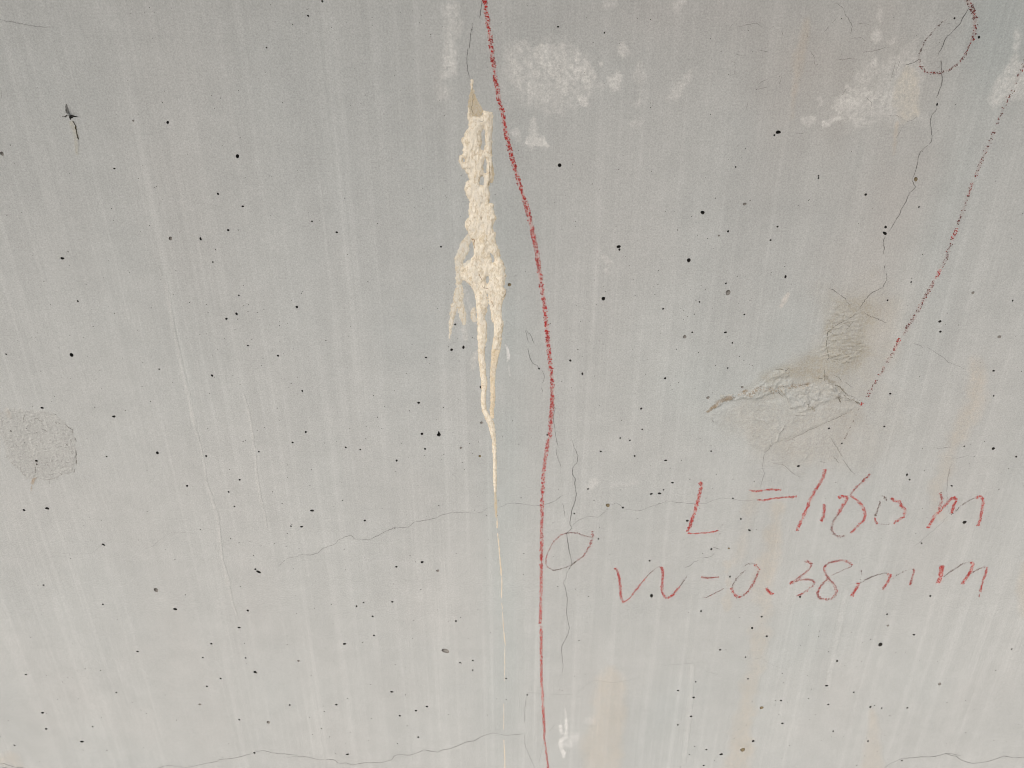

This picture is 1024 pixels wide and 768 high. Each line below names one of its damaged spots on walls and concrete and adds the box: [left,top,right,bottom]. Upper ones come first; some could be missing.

efflorescence [433,0,650,681]
efflorescence [799,4,934,136]